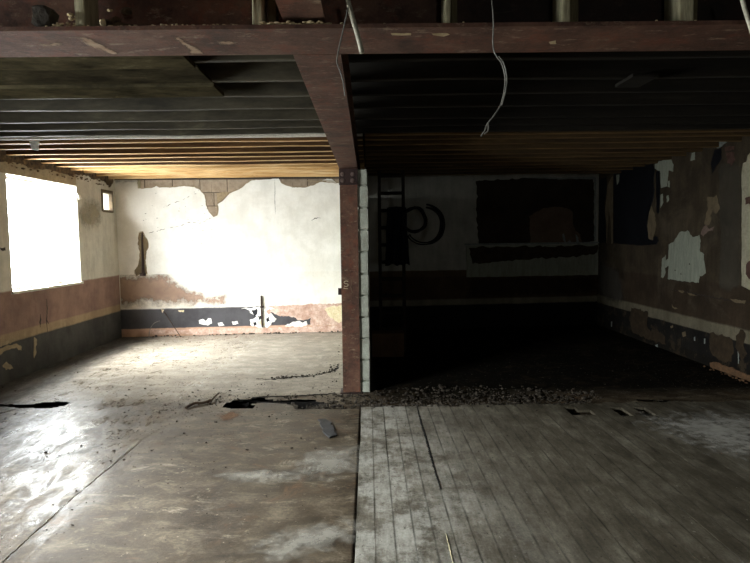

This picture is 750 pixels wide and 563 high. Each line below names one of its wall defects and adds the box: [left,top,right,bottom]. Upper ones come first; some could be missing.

spalling [134,231,149,276]
spalling [140,179,265,221]
peeling [655,160,674,208]
peeling [661,195,720,283]
peeling [741,153,750,290]
peeling [150,303,342,337]
peeling [0,343,22,370]
peeling [703,329,750,383]